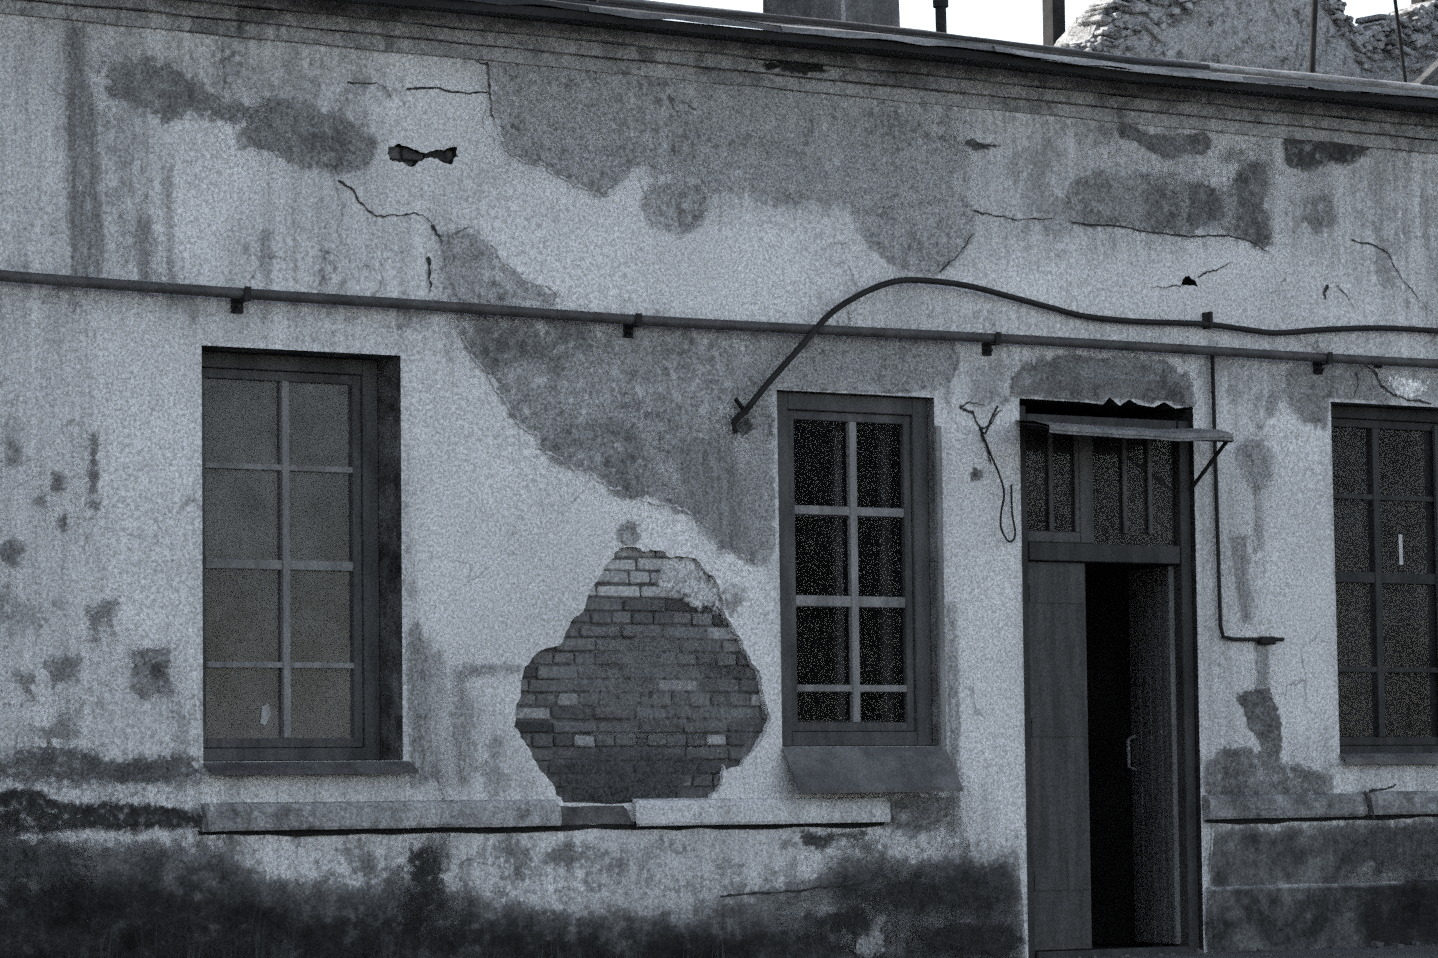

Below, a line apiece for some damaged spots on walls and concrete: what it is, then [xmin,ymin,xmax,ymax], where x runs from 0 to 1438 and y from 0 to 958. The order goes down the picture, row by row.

peeling [105,54,453,176]
crack [338,180,468,292]
crack [348,60,495,120]
peeling [488,60,1001,215]
peeling [1063,122,1274,249]
peeling [440,229,960,566]
leakage [13,653,83,701]
leakage [40,713,84,744]
leakage [86,598,119,644]
flaking render [514,519,768,825]
leakage [0,829,771,958]
leakage [804,861,1026,957]